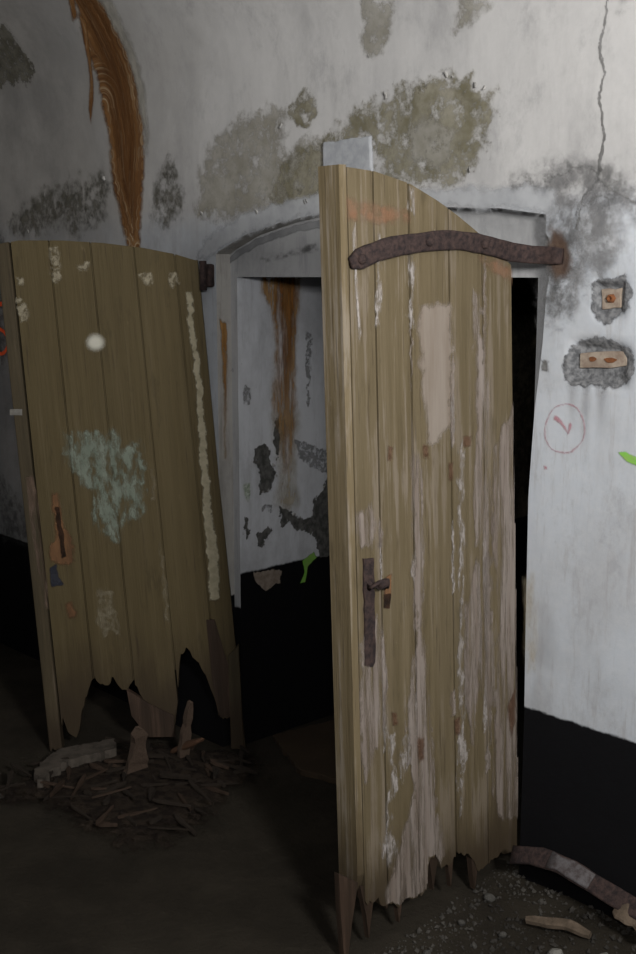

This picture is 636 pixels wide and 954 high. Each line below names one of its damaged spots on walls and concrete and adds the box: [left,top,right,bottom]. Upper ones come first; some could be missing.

peeling [0,24,36,89]
rust [69,0,148,247]
crack [558,0,636,215]
damp [546,163,612,264]
rust [262,277,300,505]
spalling [563,275,635,390]
peeling [243,418,330,558]